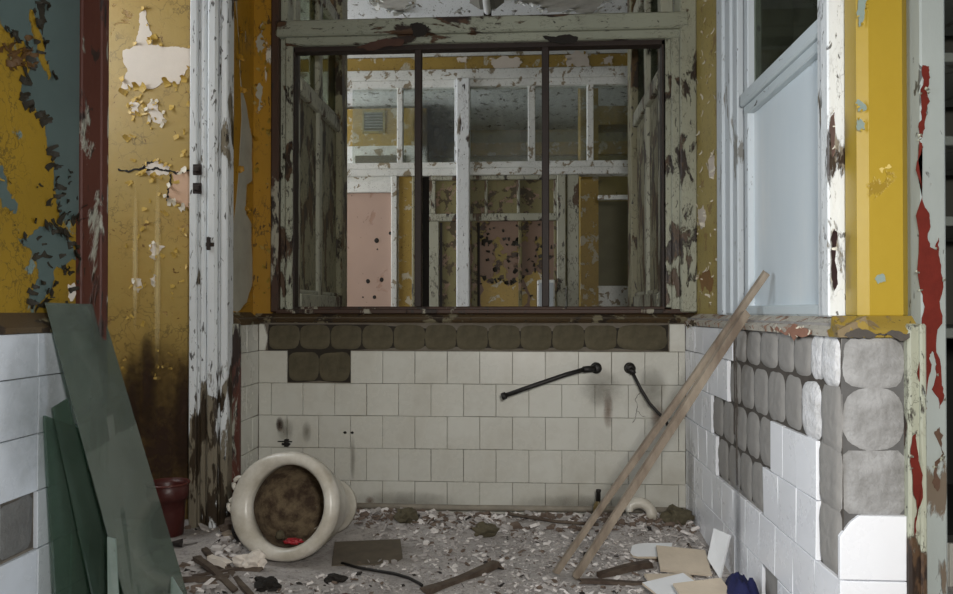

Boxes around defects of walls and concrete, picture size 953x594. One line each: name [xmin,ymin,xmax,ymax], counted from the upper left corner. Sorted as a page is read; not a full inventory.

peeling [0,0,88,313]
peeling [118,6,190,129]
crack [118,161,190,201]
peeling [125,149,190,251]
peeling [129,240,187,299]
peeling [357,0,429,51]
peeling [830,229,838,290]
peeling [855,99,867,132]
peeling [856,0,868,27]
peeling [915,65,946,409]
leakage [107,341,189,520]
peeling [713,323,946,575]